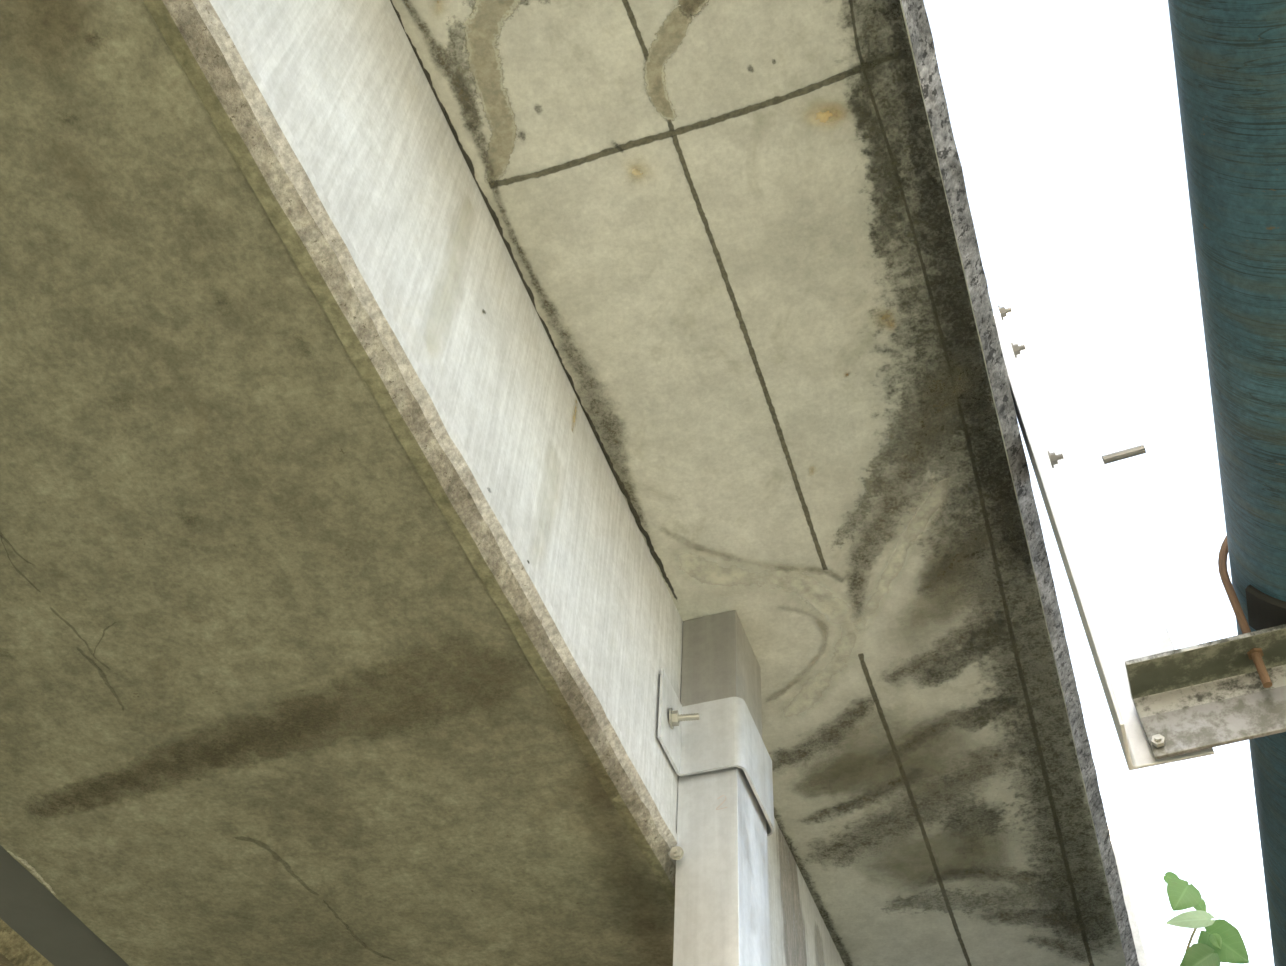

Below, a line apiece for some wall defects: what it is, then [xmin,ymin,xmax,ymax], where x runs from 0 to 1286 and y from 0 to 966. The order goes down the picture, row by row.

damp [448,0,528,182]
damp [644,0,709,121]
damp [773,0,1117,966]